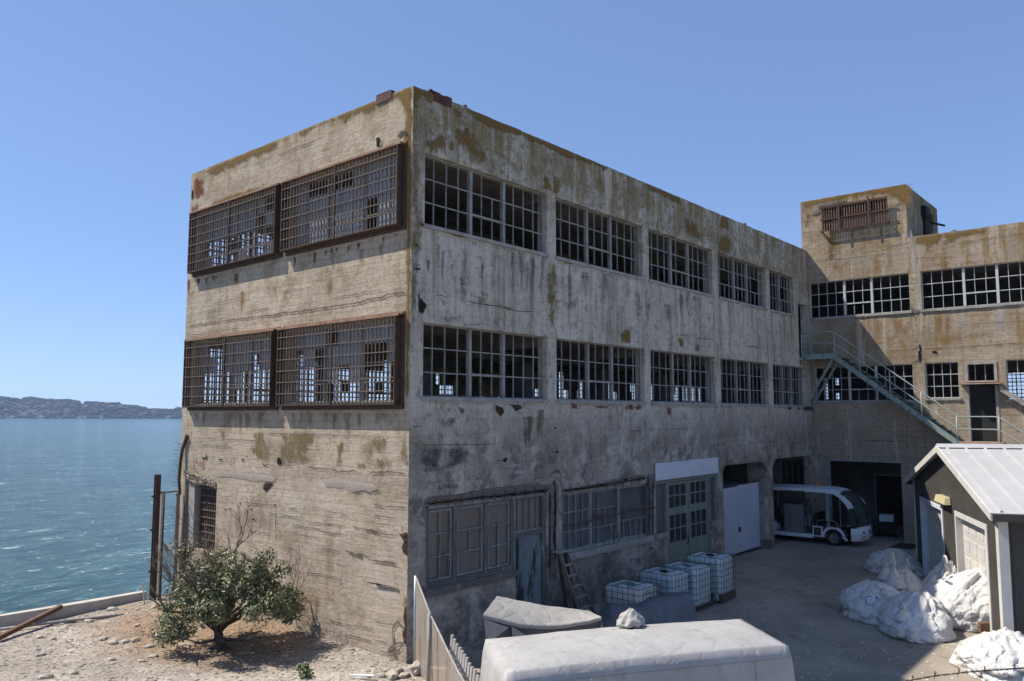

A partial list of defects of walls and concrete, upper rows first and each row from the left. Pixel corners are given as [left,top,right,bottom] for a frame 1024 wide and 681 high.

corrosion [192,178,203,211]
crack [434,295,533,326]
spalling [496,405,522,416]